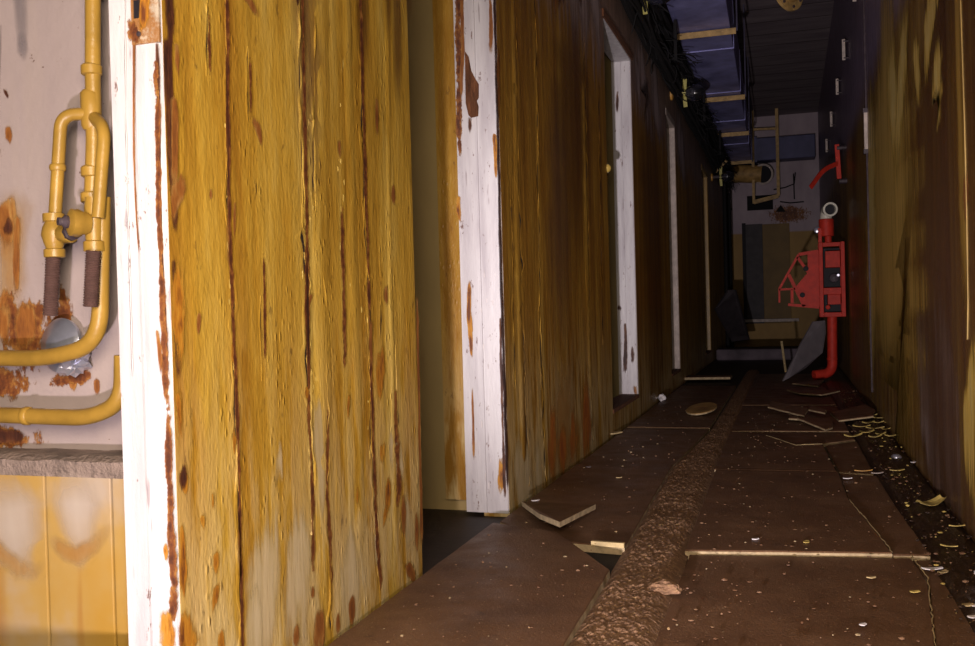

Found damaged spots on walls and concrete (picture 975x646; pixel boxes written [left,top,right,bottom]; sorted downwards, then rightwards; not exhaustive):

corrosion [127,0,150,250]
corrosion [249,57,262,144]
corrosion [454,0,465,156]
corrosion [0,197,73,350]
corrosion [153,0,199,646]
corrosion [0,366,40,402]
corrosion [49,370,100,393]
corrosion [0,425,44,448]
corrosion [212,585,220,610]